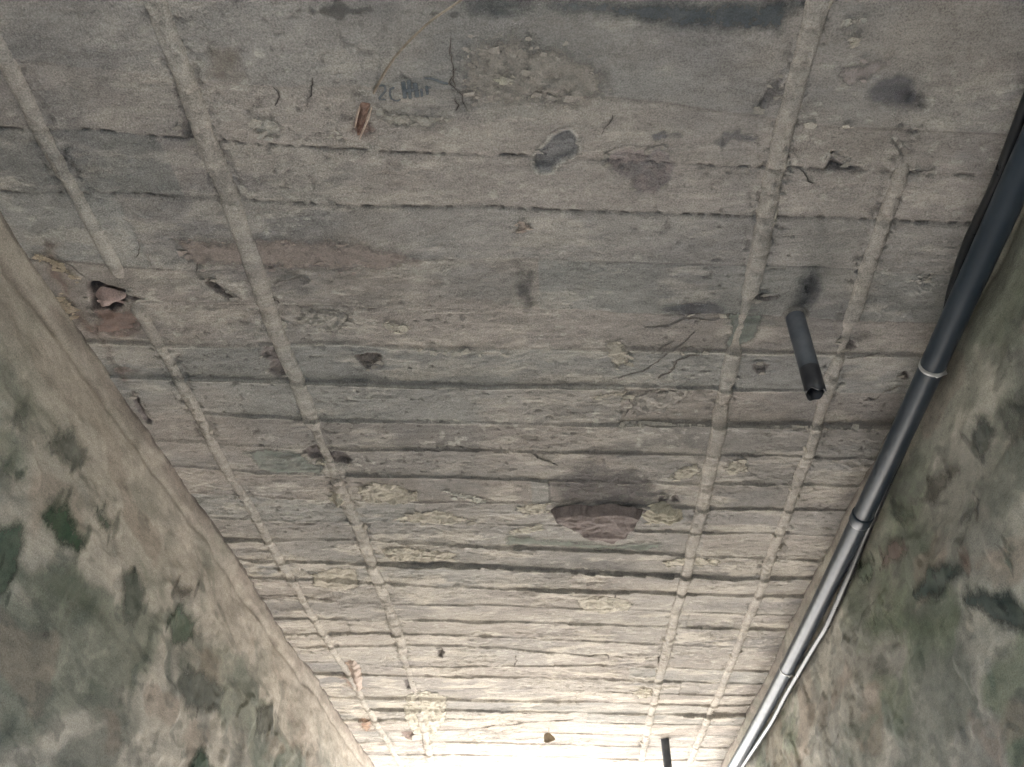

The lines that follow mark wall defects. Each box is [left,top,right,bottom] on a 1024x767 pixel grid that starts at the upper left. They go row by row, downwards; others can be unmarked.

crack [448,37,468,112]
damp [871,76,912,103]
spalling [529,127,583,176]
spalling [32,254,146,322]
crack [620,313,729,417]